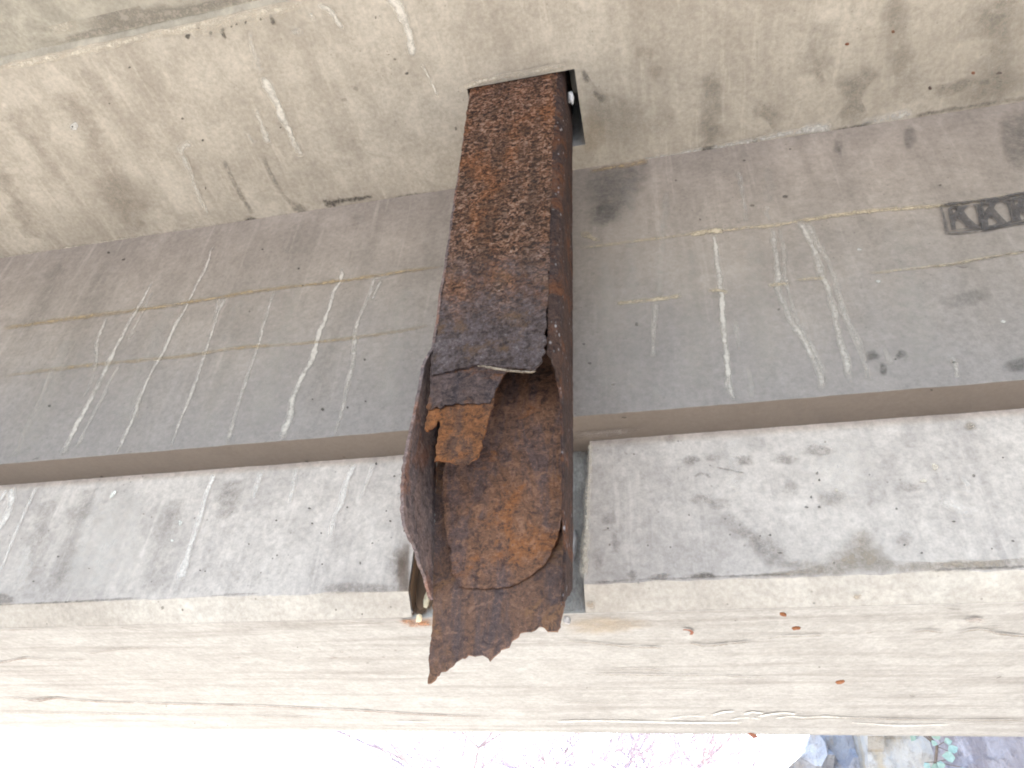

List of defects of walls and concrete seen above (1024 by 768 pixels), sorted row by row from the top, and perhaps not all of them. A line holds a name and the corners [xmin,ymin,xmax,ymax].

water stain [64,286,150,450]
water stain [120,251,212,446]
water stain [175,299,224,433]
water stain [282,270,344,435]
water stain [337,277,381,426]
rust [424,388,498,465]
peeling [426,346,562,590]
water stain [713,236,738,396]
water stain [772,232,824,385]
water stain [799,223,886,374]
rust [399,552,434,626]